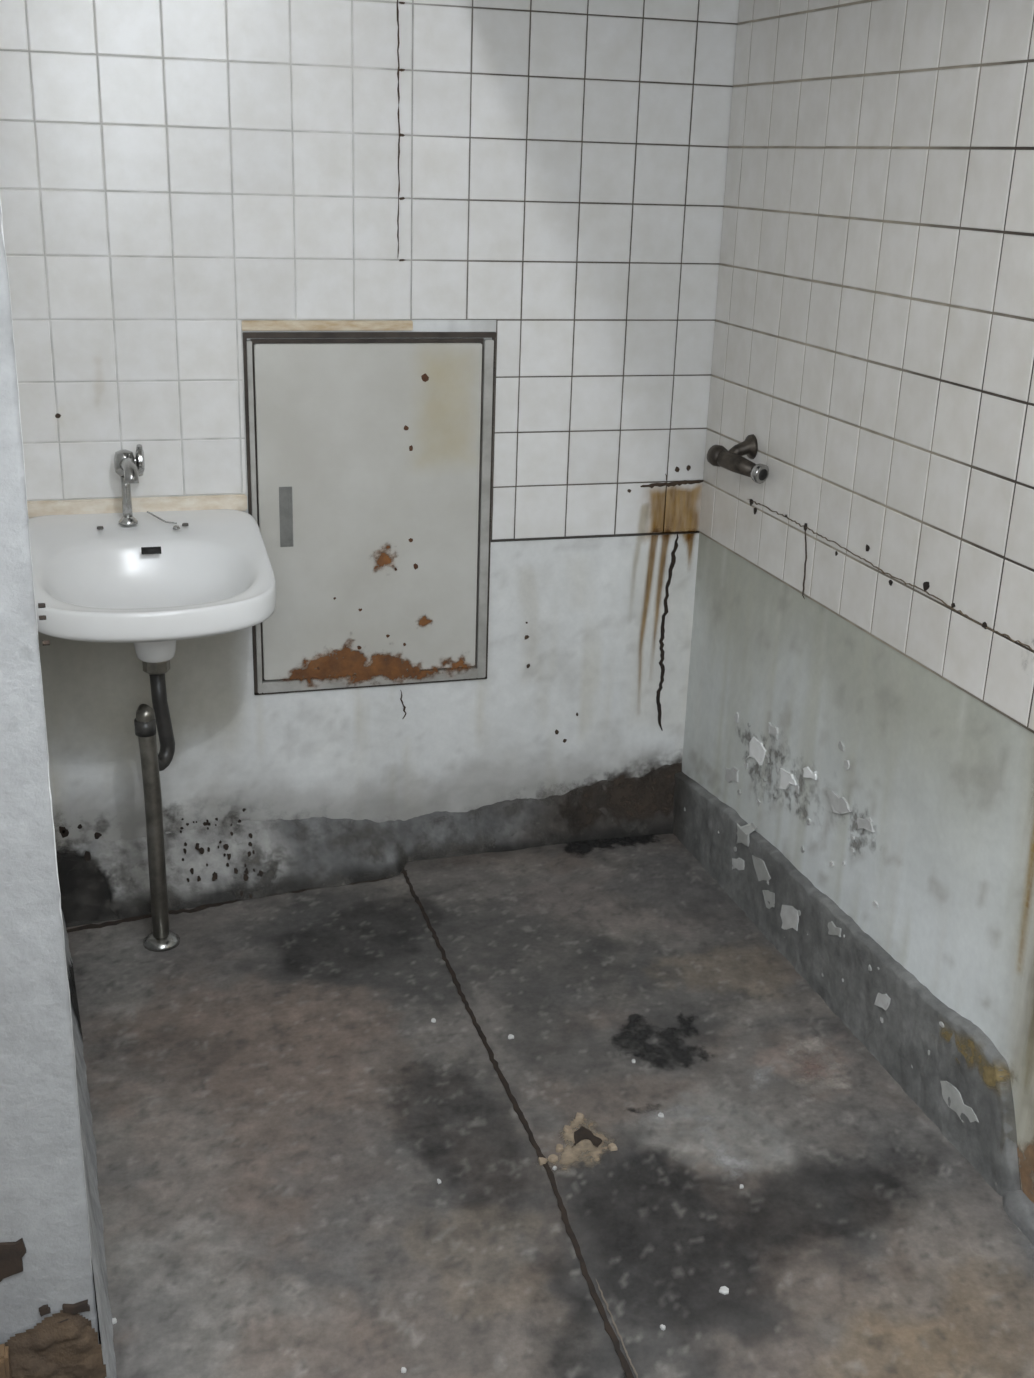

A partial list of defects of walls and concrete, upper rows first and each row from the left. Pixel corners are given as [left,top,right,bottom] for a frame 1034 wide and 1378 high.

corrosion [374,545,397,572]
corrosion [627,465,703,601]
crack [749,499,1034,651]
corrosion [284,635,470,687]
crack [656,534,679,731]
leakage [56,821,136,924]
leakage [163,808,280,900]
leakage [534,760,682,855]
peeling [732,823,808,935]
crack [66,867,638,1378]
spalling [0,1238,26,1282]
spalling [5,1299,107,1378]